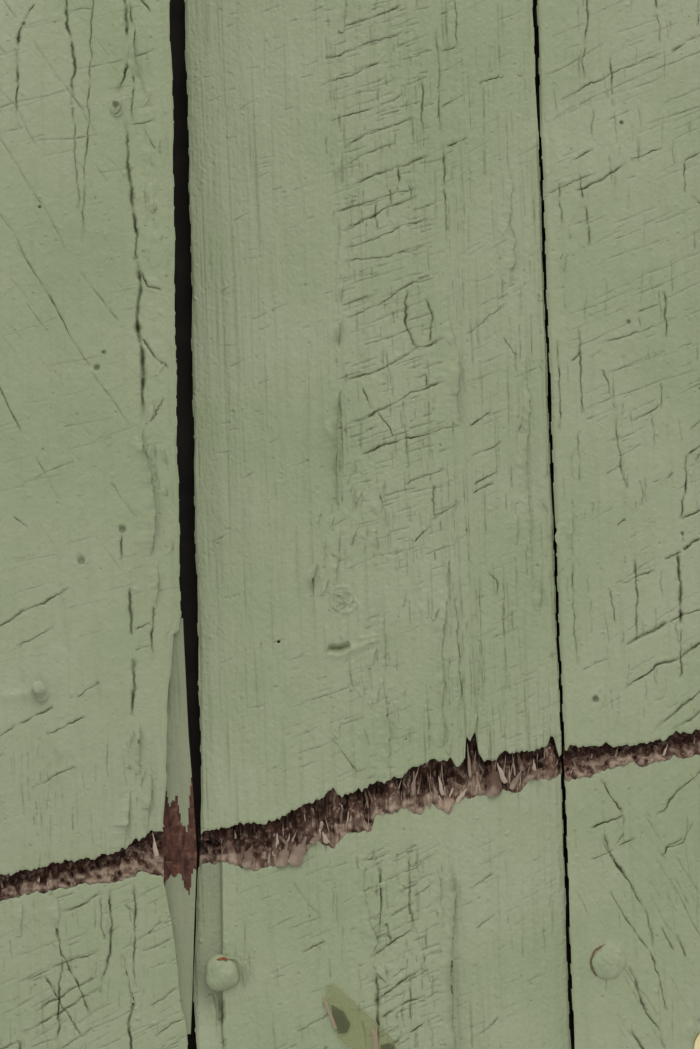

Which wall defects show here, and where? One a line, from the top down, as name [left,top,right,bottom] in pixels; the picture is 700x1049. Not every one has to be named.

crack [0,682,100,757]
crack [31,766,77,789]
crack [298,717,364,780]
crack [470,873,493,890]